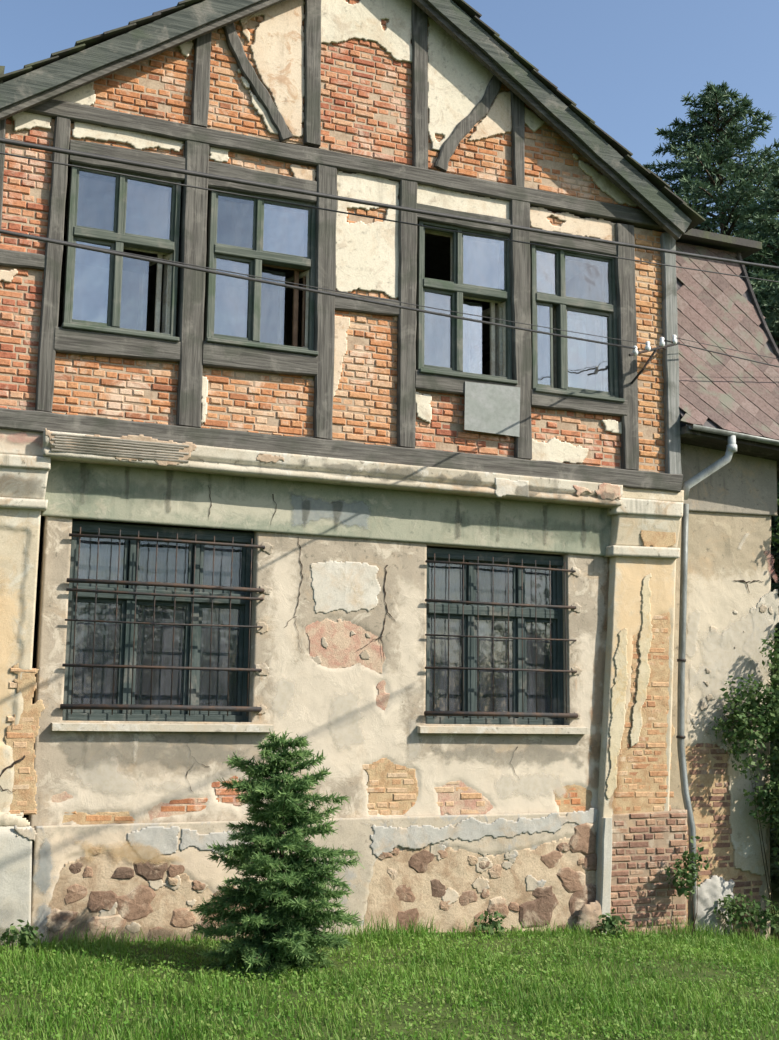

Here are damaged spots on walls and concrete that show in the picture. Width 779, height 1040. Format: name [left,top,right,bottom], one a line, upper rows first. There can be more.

spalling [45,428,197,467]
crack [284,538,303,651]
spalling [305,618,390,710]
crack [357,565,392,657]
peeling [733,589,779,672]
crack [0,755,26,792]
spalling [4,663,45,841]
spalling [148,776,247,820]
spalling [362,758,418,816]
spalling [606,573,763,937]
spalling [46,847,254,943]
spalling [364,780,597,934]